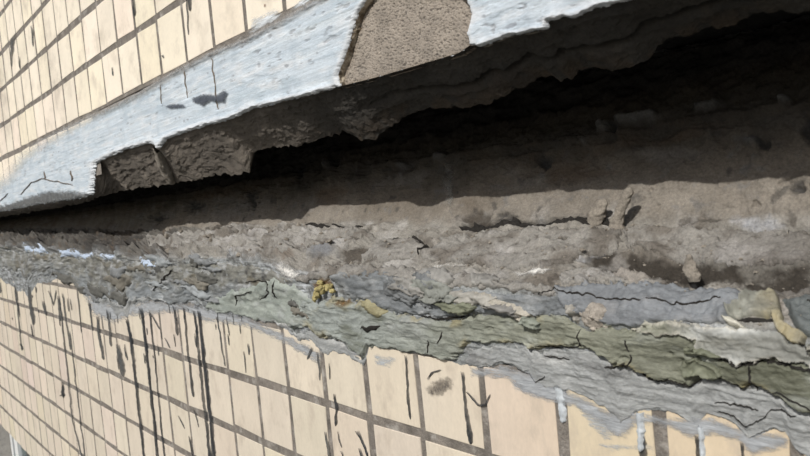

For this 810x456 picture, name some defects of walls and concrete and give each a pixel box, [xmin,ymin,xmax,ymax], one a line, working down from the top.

spalling [338,0,477,90]
crack [0,171,73,201]
water stain [12,286,23,350]
water stain [28,287,216,456]
water stain [215,313,242,366]
water stain [278,263,299,280]
water stain [333,396,344,456]
water stain [428,370,449,394]
water stain [461,374,490,444]
crack [538,287,721,306]
crack [605,340,810,427]
peeling [631,287,810,369]